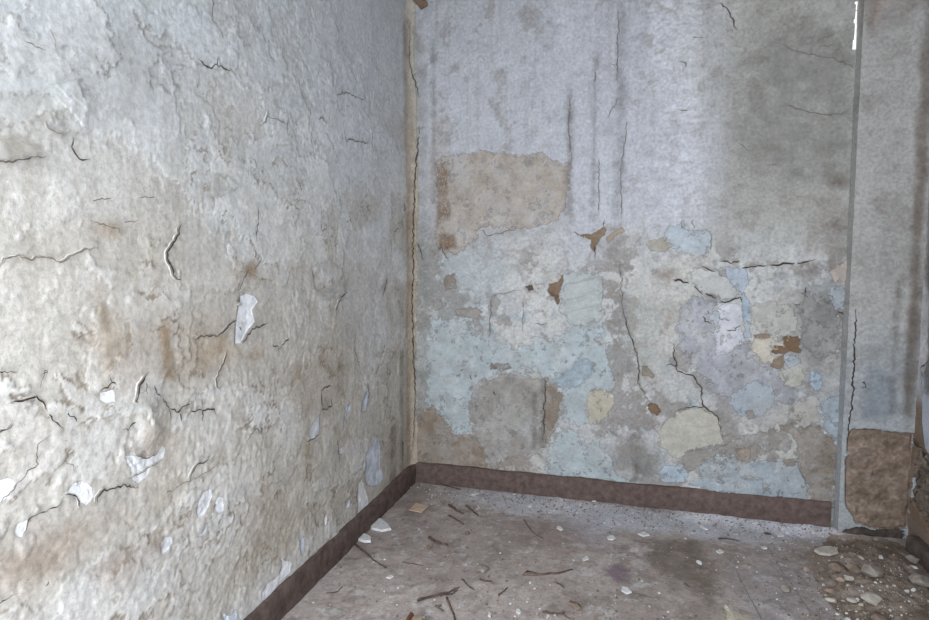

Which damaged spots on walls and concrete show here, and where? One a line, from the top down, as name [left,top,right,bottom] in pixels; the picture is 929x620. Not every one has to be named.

flaking render [433,149,573,255]
crack [0,370,77,503]
crack [22,446,162,536]
peeling [125,446,165,484]
crack [102,210,289,430]
peeling [235,293,257,344]
peeling [421,271,629,483]
crack [666,343,723,439]
crack [673,223,815,331]
flaking render [657,260,929,545]
crack [794,287,867,458]
peeling [262,558,291,601]